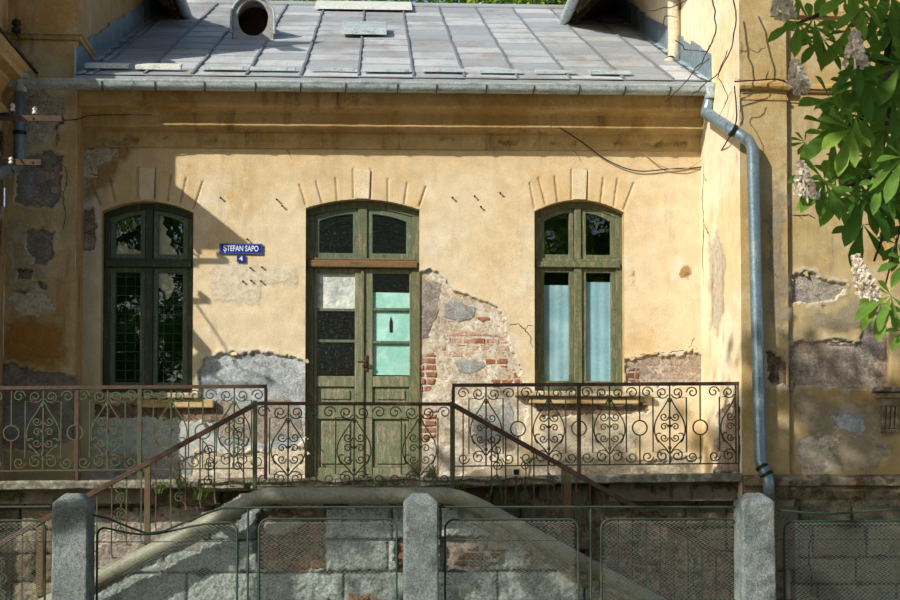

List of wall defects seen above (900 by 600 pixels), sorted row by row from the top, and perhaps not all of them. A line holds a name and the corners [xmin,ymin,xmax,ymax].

spalling [15,90,65,208]
spalling [76,147,118,178]
peeling [5,227,56,318]
spalling [788,271,849,305]
spalling [2,362,82,451]
spalling [94,350,310,480]
spalling [420,270,649,475]
spalling [624,350,701,388]
spalling [766,312,888,391]
peeling [794,406,865,473]